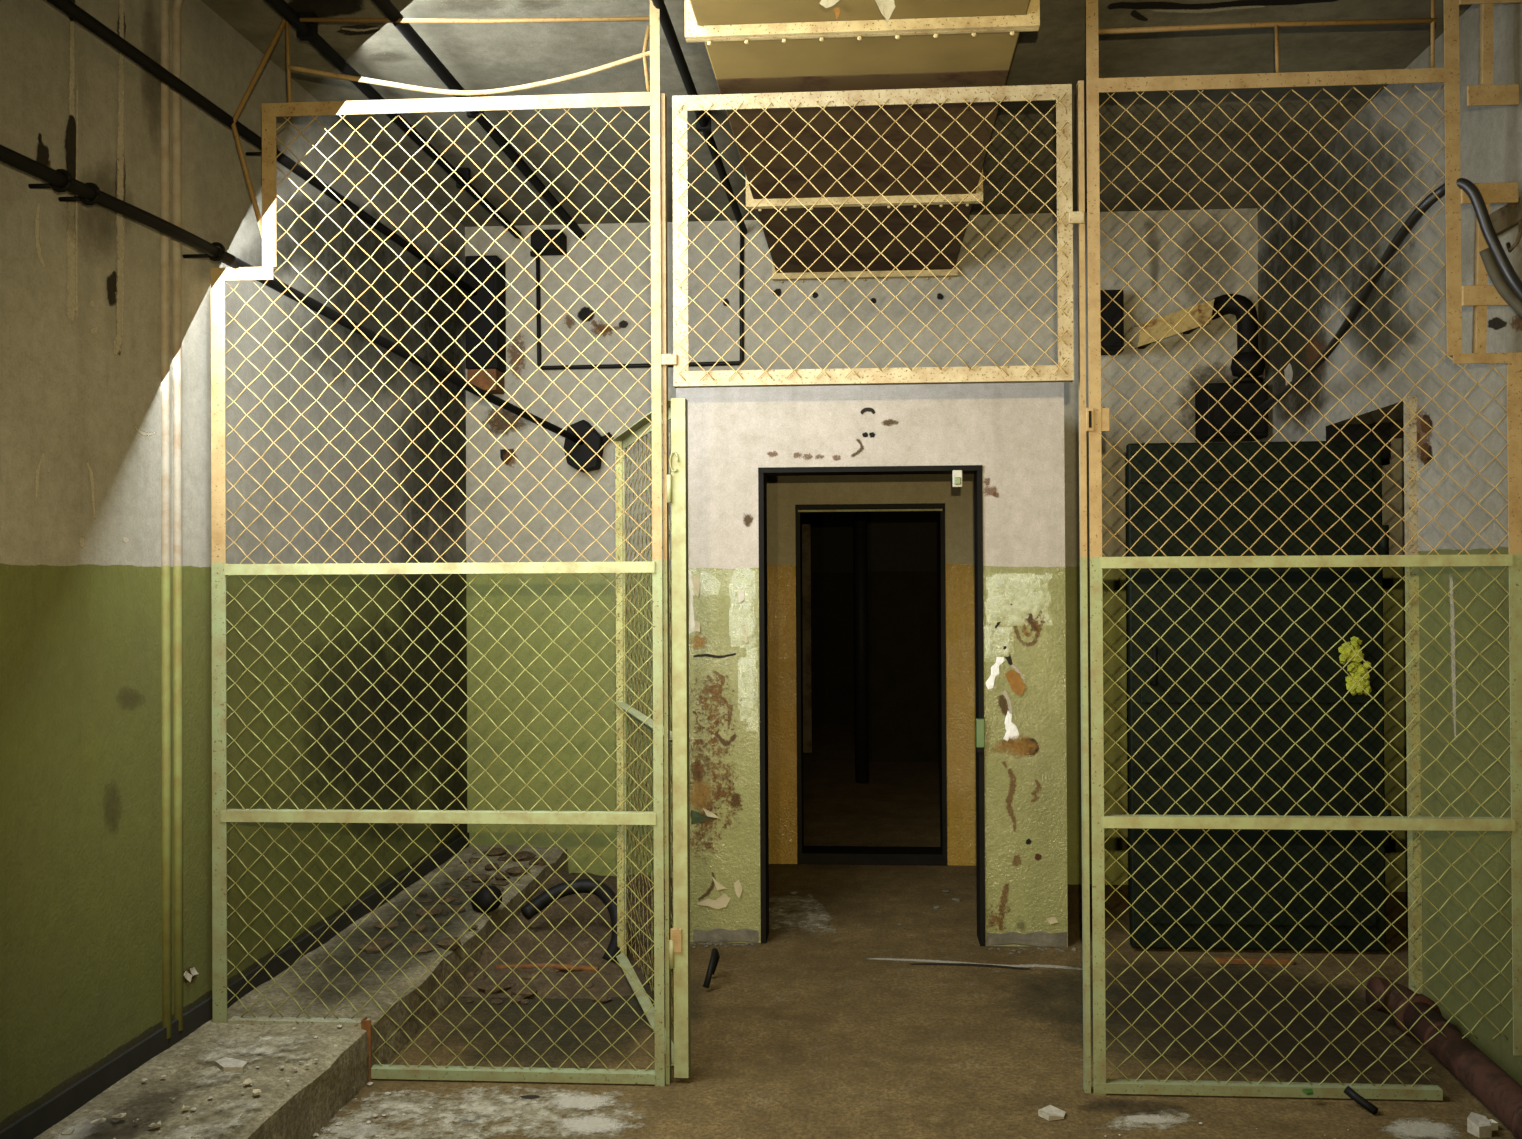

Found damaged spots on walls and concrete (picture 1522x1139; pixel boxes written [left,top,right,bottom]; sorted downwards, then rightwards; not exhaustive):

peeling [820,0,840,20]
peeling [875,0,895,22]
peeling [986,646,1026,741]
peeling [690,808,718,824]
peeling [697,872,742,909]
spalling [693,928,759,943]